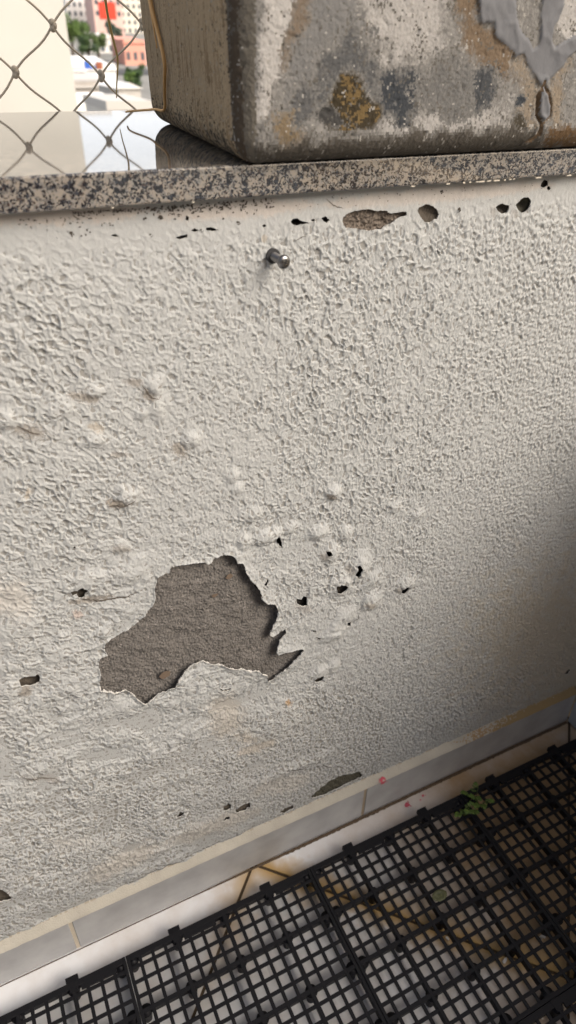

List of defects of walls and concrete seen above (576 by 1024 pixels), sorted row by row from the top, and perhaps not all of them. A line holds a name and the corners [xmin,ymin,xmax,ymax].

spalling [343,209,407,231]
peeling [99,555,304,705]
spalling [311,772,362,798]